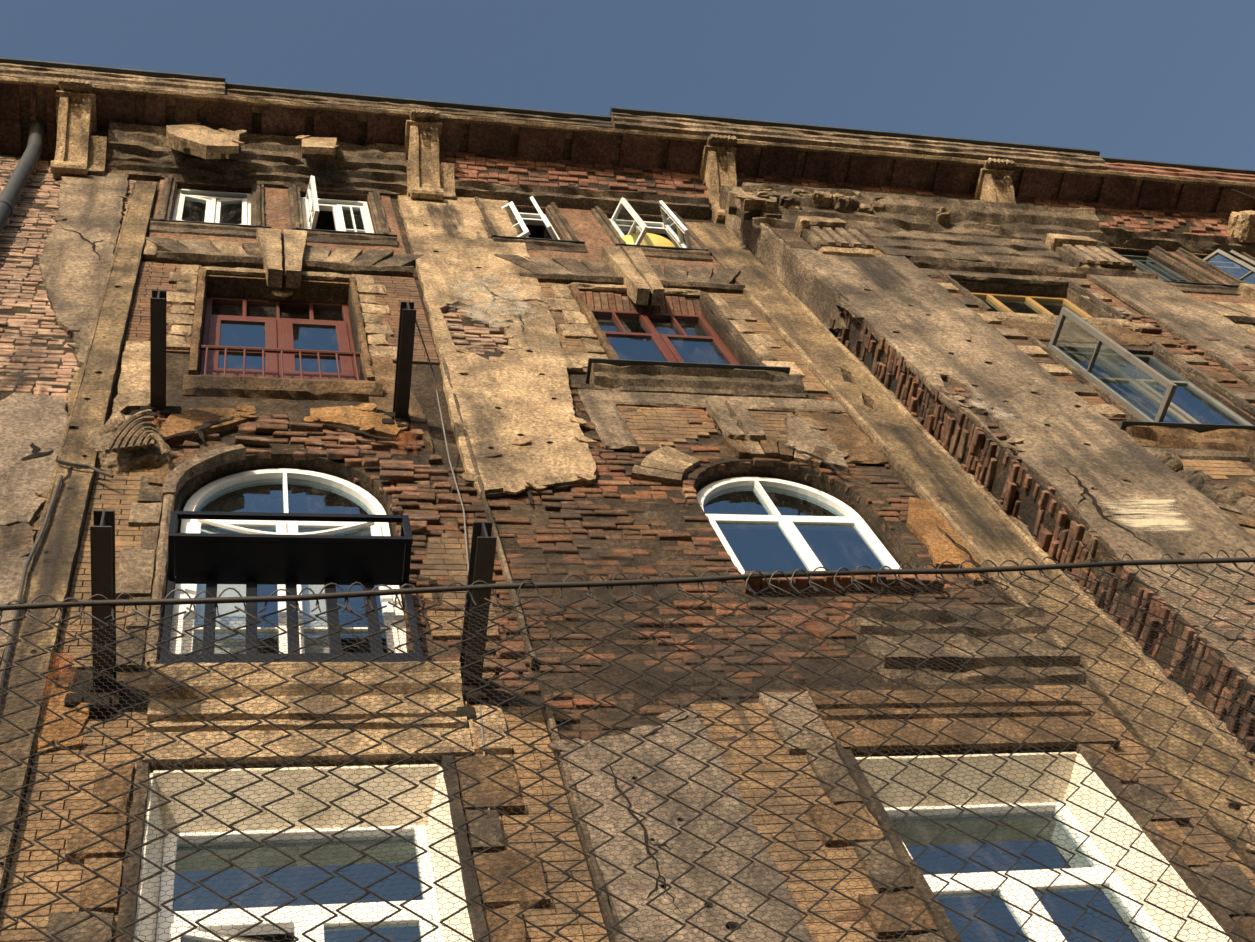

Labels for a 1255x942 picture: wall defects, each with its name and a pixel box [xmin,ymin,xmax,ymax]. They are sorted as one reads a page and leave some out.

crack [63,228,103,258]
flaking render [157,195,1006,942]
flaking render [830,297,1255,766]
crack [1064,467,1151,545]
peeling [33,680,89,755]
crack [606,762,681,912]
peeling [1226,795,1255,853]